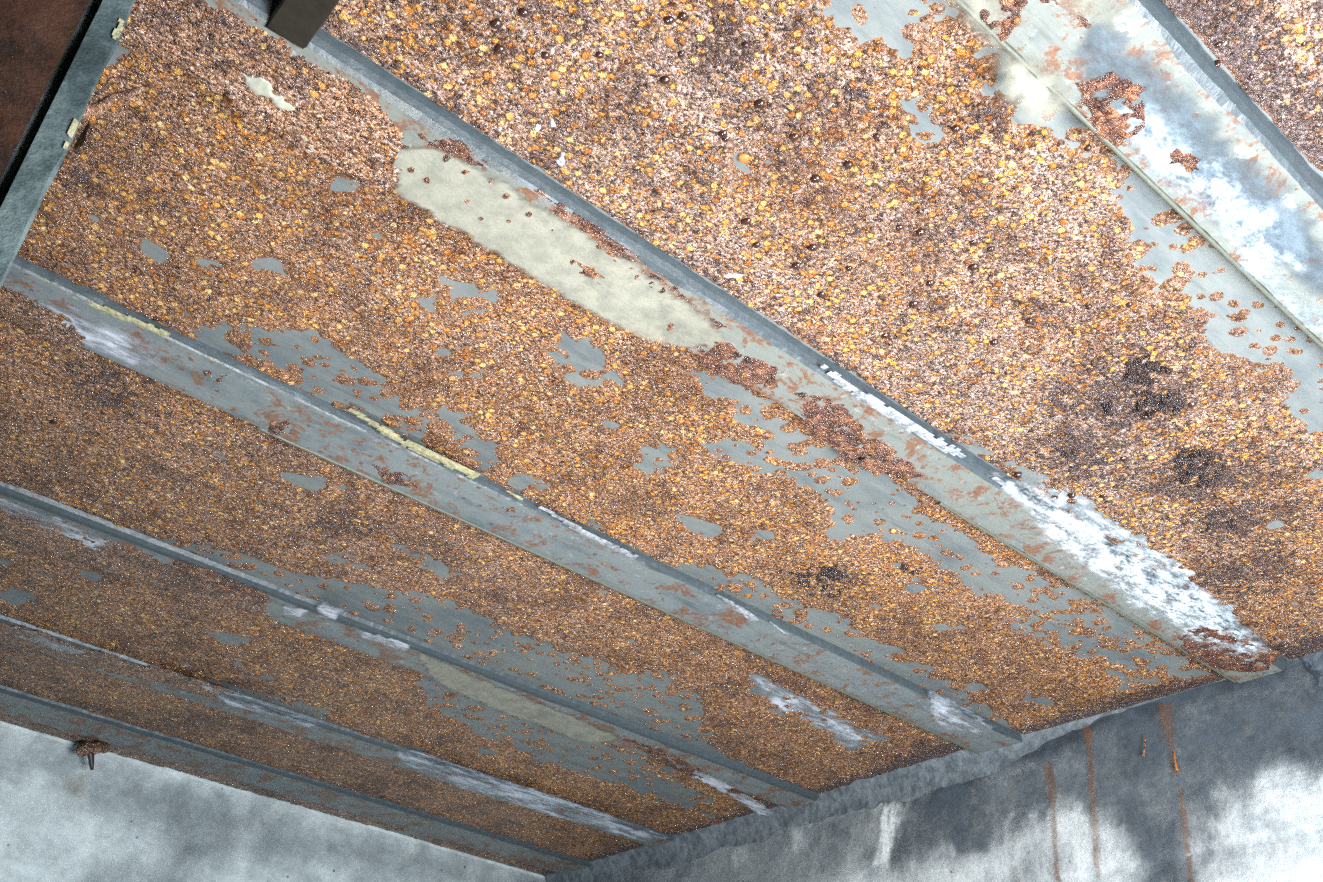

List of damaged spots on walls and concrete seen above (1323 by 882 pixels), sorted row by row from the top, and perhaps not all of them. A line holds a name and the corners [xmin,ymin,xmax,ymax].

rust [1162,0,1323,171]
peeling [36,275,171,338]
peeling [348,408,481,480]
peeling [392,148,725,346]
rust [17,0,1285,734]
peeling [820,364,966,458]
water stain [1130,116,1323,330]
rust [1270,334,1296,343]
rust [0,284,965,876]
peeling [539,506,638,559]
water stain [1007,482,1263,656]
water stain [894,659,1323,882]